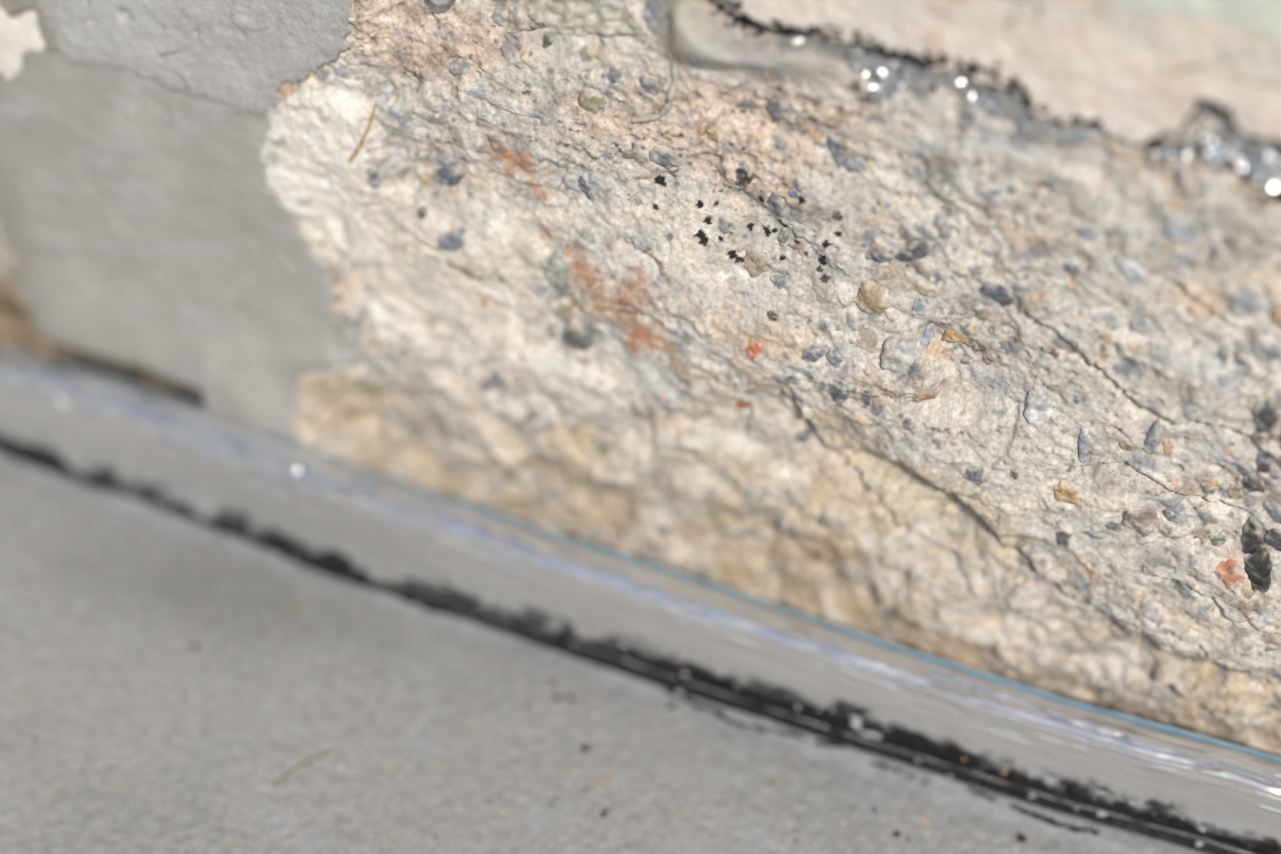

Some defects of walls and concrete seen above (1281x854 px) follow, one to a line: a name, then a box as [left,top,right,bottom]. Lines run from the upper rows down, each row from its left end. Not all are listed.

peeling [0,7,45,80]
spalling [0,227,205,408]
spalling [258,0,1281,757]